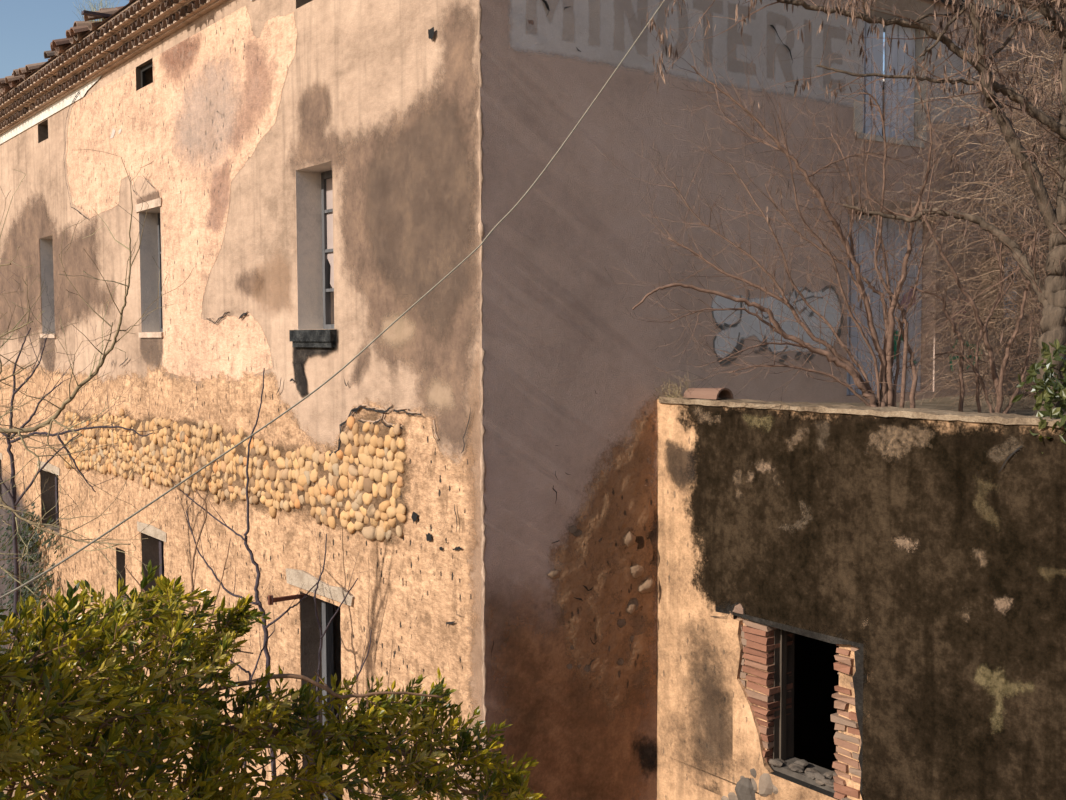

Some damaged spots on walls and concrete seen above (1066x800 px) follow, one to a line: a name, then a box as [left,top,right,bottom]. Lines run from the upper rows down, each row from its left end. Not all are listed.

leakage [0,196,114,371]
spalling [0,5,479,800]
leakage [290,4,480,450]
leakage [666,404,1066,800]